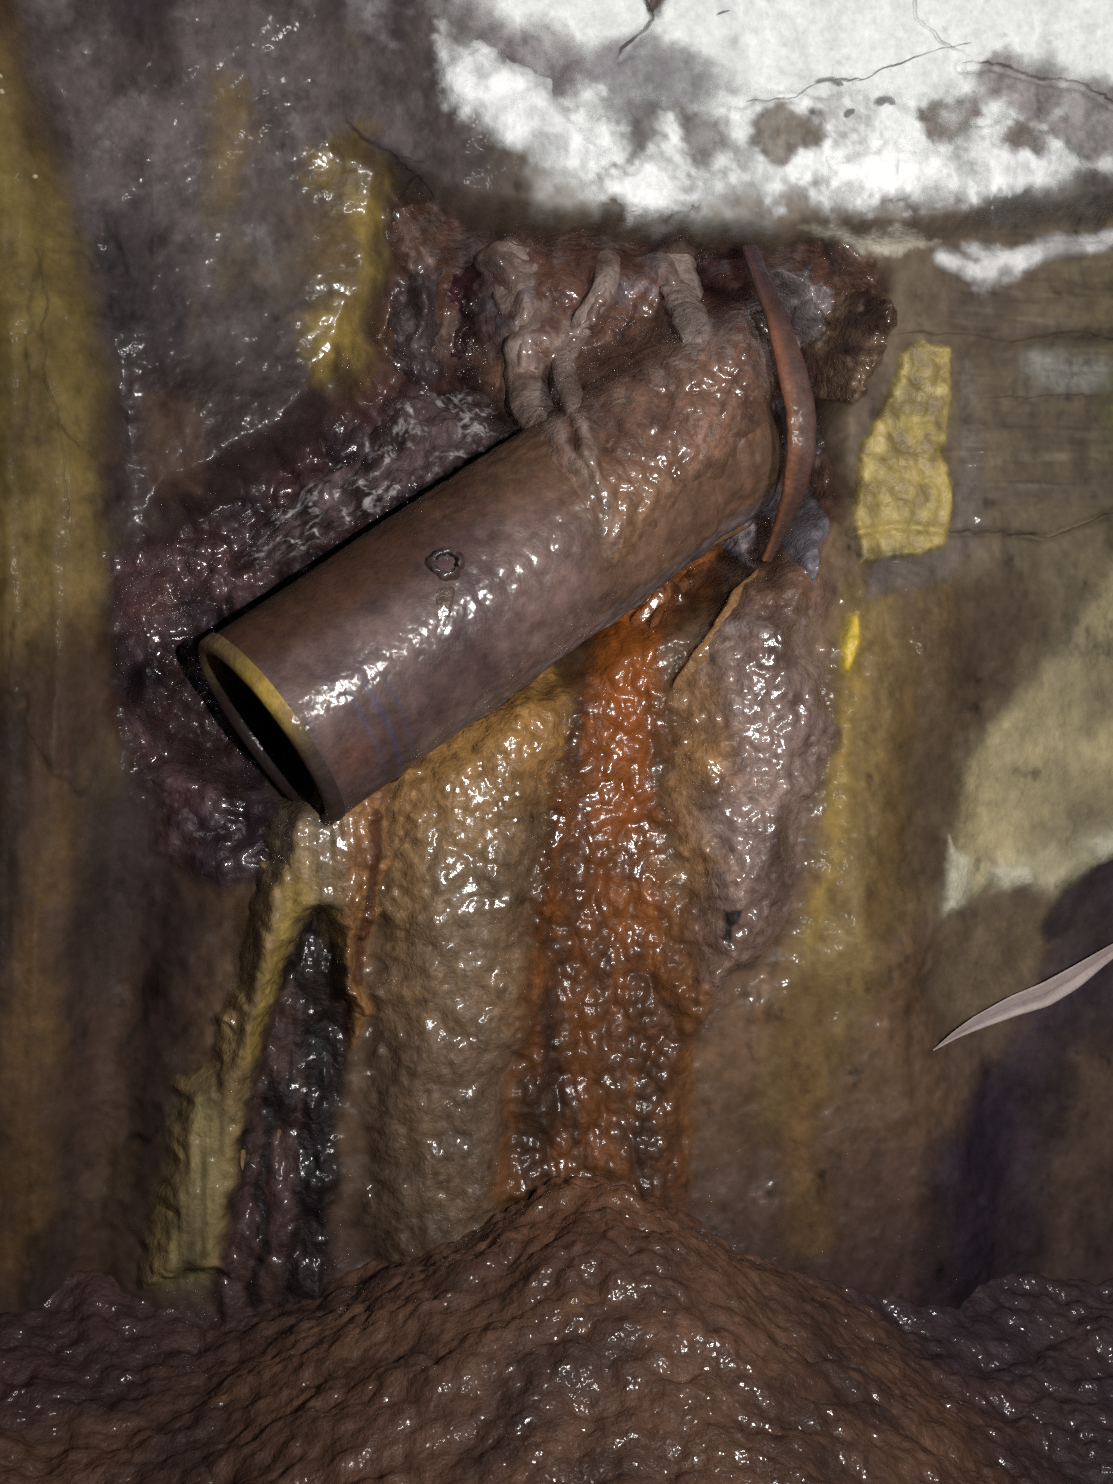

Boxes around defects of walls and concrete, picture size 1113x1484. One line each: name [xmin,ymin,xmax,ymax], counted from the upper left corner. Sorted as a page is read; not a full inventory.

spalling [619,0,668,56]
water stain [437,38,1113,226]
crack [749,0,1113,117]
water stain [813,225,924,254]
water stain [935,230,1113,285]
water stain [1024,352,1113,390]
water stain [0,0,513,1313]
rust [496,544,764,1216]
water stain [771,339,1025,1246]
water stain [920,857,1113,1309]